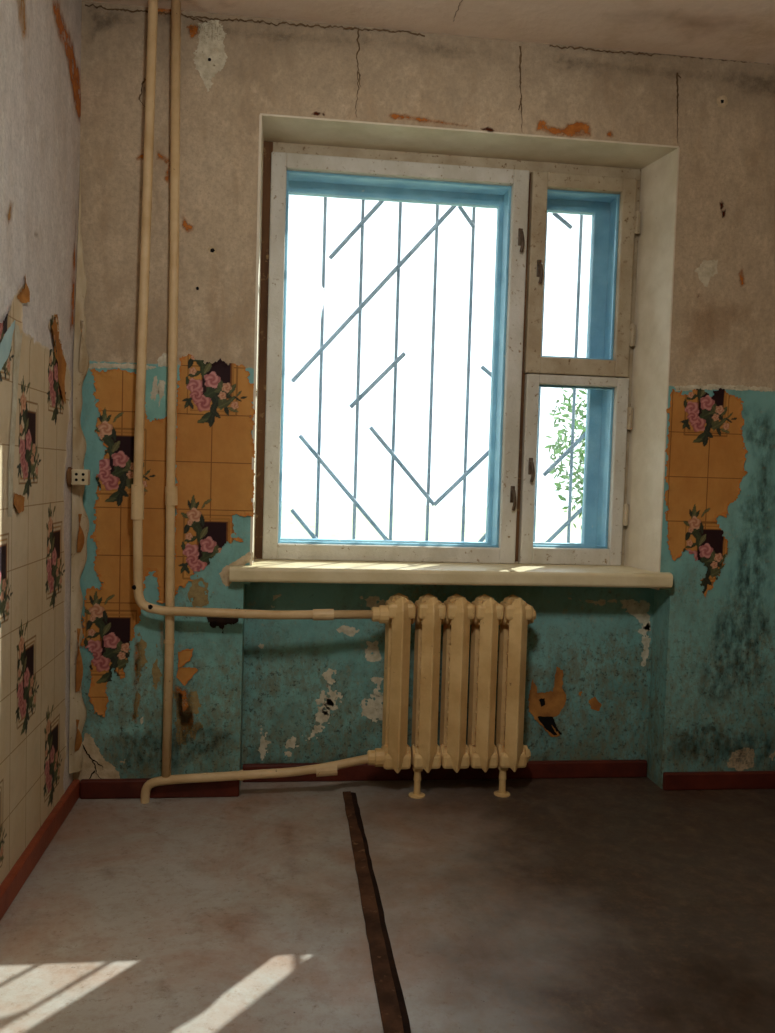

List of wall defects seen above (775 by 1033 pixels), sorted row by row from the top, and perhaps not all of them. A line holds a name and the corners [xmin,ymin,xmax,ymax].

crack [85,4,425,117]
crack [550,45,769,142]
peeling [89,353,168,422]
peeling [77,514,85,552]
peeling [187,552,254,633]
peeling [75,628,83,692]
flaking render [73,719,125,781]
peeling [132,633,162,724]
peeling [173,667,204,745]
peeling [336,625,381,662]
peeling [361,677,384,722]
peeling [538,698,562,735]